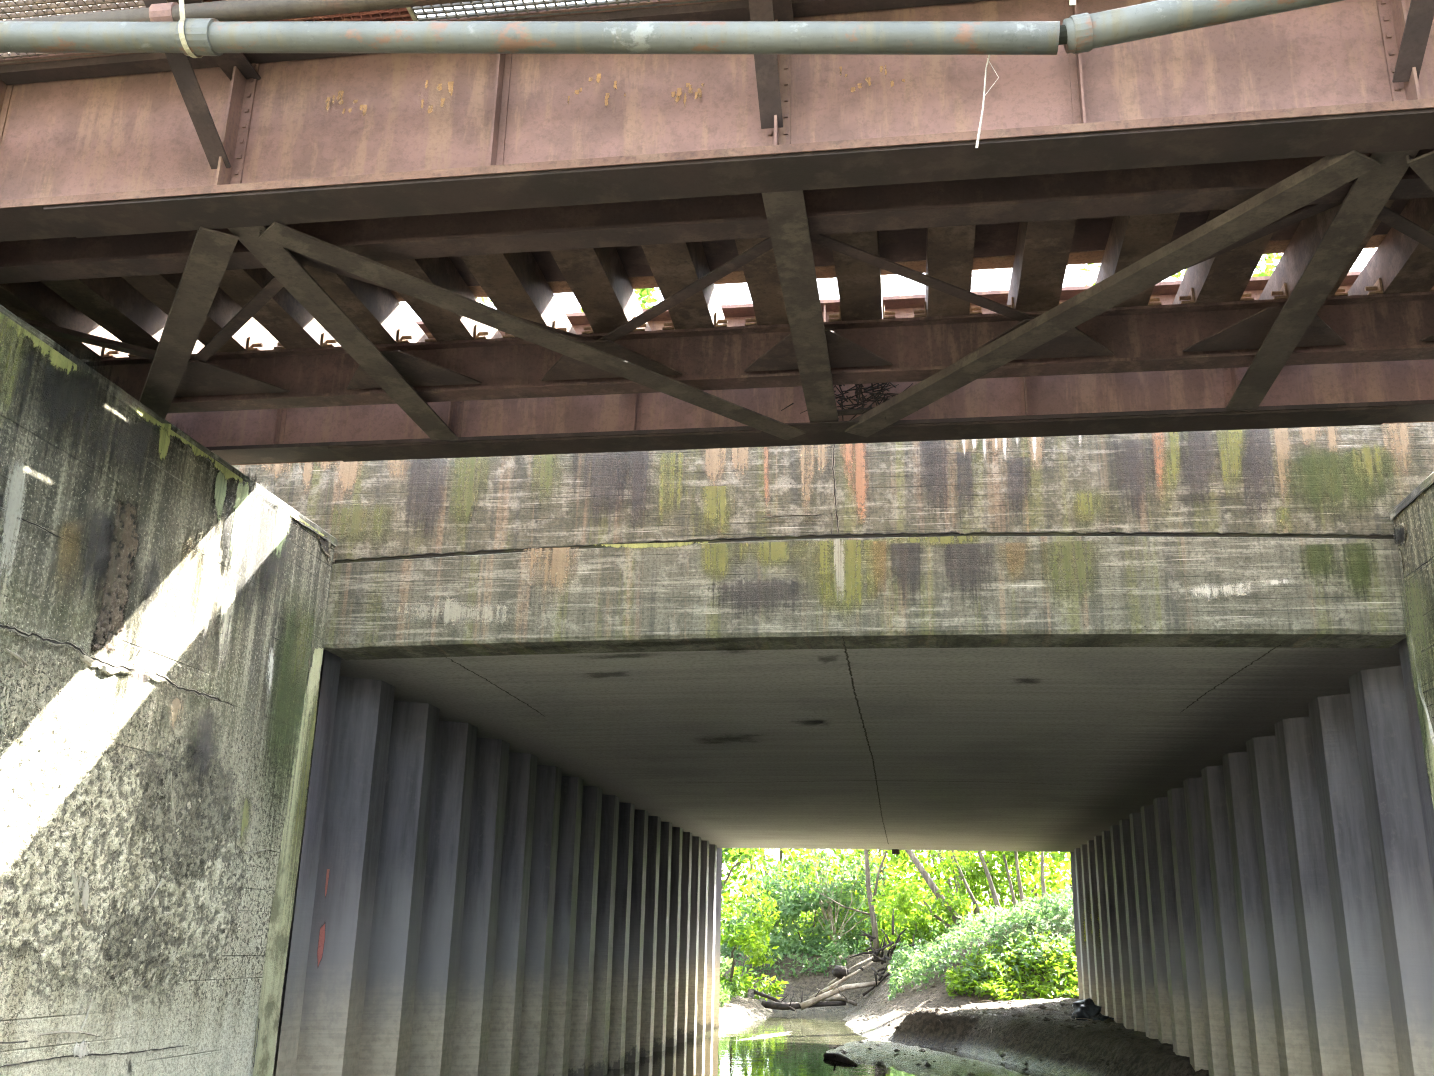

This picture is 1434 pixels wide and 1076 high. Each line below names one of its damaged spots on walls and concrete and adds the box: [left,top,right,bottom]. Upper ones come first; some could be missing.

water stain [406,457,490,537]
water stain [532,451,686,523]
corrosion [704,447,769,502]
corrosion [799,443,868,519]
water stain [917,437,1036,517]
water stain [701,486,921,615]
water stain [943,543,992,601]
crack [0,623,234,706]
water stain [202,470,315,861]
water stain [1400,509,1434,784]
crack [0,1040,188,1075]
crack [252,1019,260,1067]